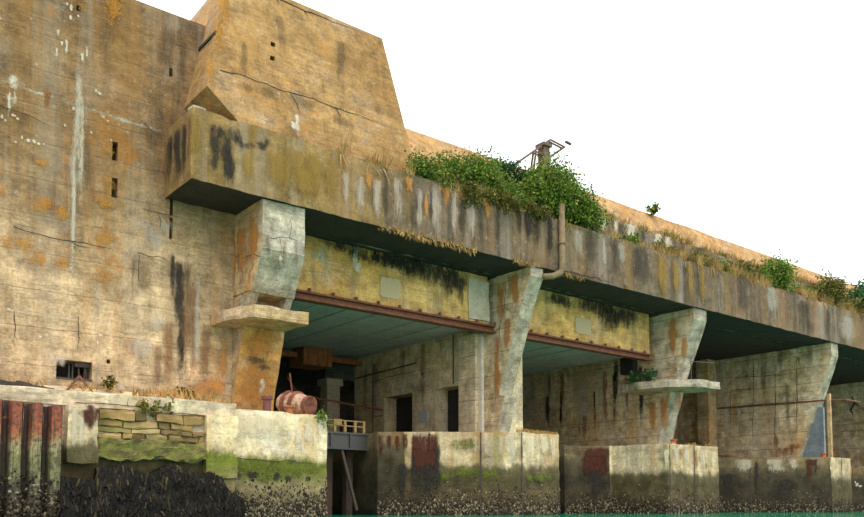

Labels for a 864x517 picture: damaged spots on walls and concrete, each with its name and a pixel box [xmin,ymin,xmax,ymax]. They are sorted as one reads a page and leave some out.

crack [220,70,376,122]
damp [71,80,152,251]
damp [166,122,196,180]
damp [210,126,285,182]
damp [296,154,401,215]
damp [412,189,439,226]
damp [452,193,483,233]
damp [320,239,467,305]
damp [170,255,185,372]
damp [549,293,638,333]
rust [379,434,438,473]
rust [582,447,609,475]